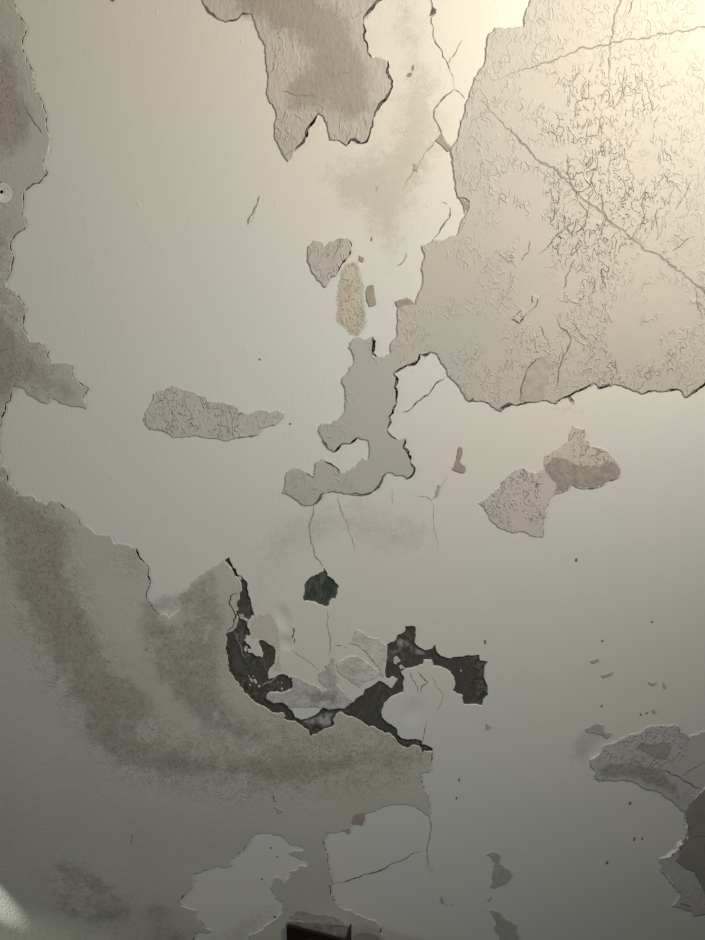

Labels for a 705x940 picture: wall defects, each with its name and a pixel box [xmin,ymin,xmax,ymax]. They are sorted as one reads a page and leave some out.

peeling [202,0,393,162]
crack [405,0,464,186]
peeling [0,0,89,426]
peeling [282,0,705,506]
peeling [143,385,291,442]
peeling [0,452,488,940]
damp [251,614,281,671]
crack [333,818,432,884]
peeling [584,708,705,916]